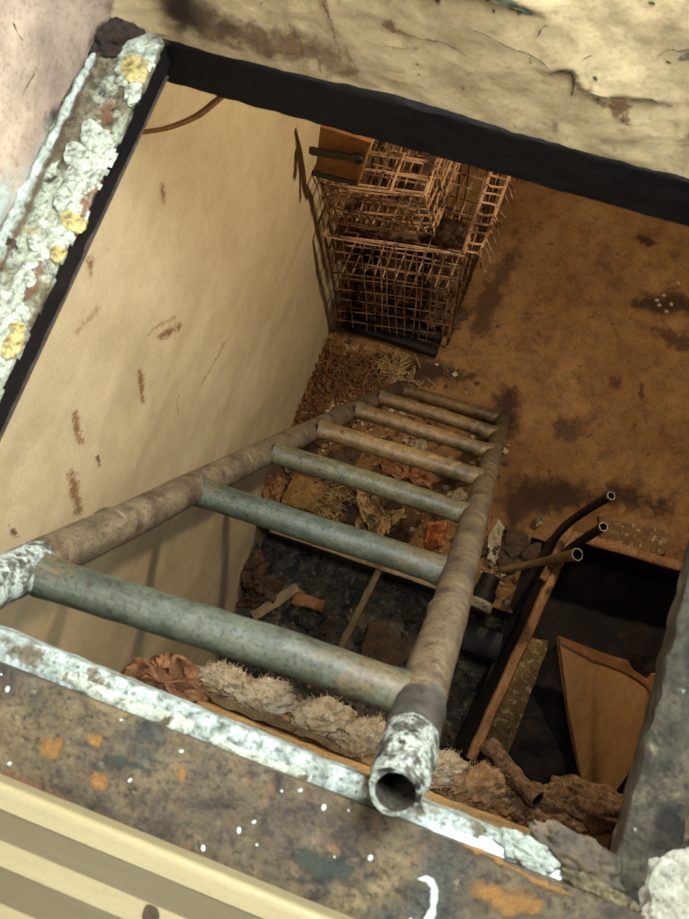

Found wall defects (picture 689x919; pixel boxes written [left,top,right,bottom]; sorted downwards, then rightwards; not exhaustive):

peeling [113,32,160,107]
damp [164,0,359,76]
crack [474,0,658,105]
peeling [0,118,118,370]
rust [67,469,83,515]
rust [41,738,62,758]
rust [88,736,102,747]
rust [1,768,73,803]
rust [91,773,107,790]